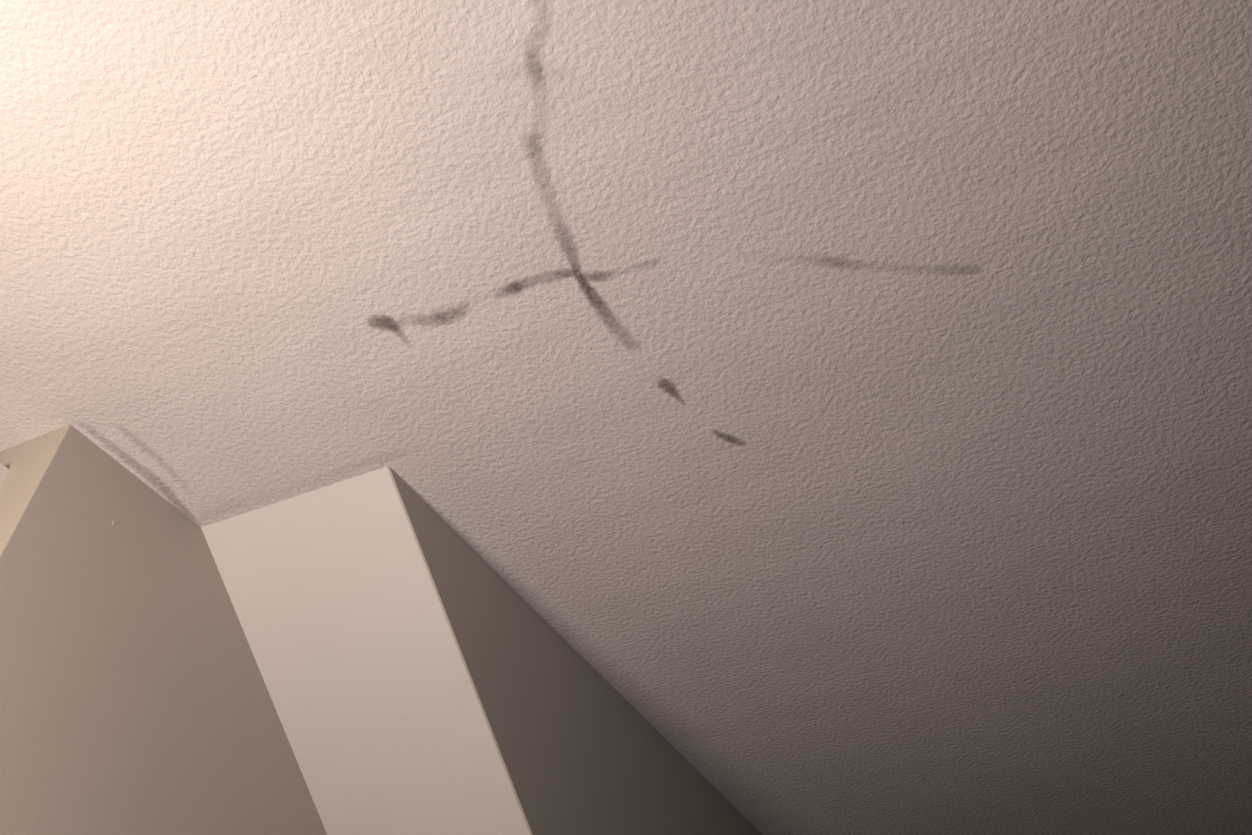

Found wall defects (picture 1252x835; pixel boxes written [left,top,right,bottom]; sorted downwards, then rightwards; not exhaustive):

crack [565,271,601,308]
crack [376,318,393,327]